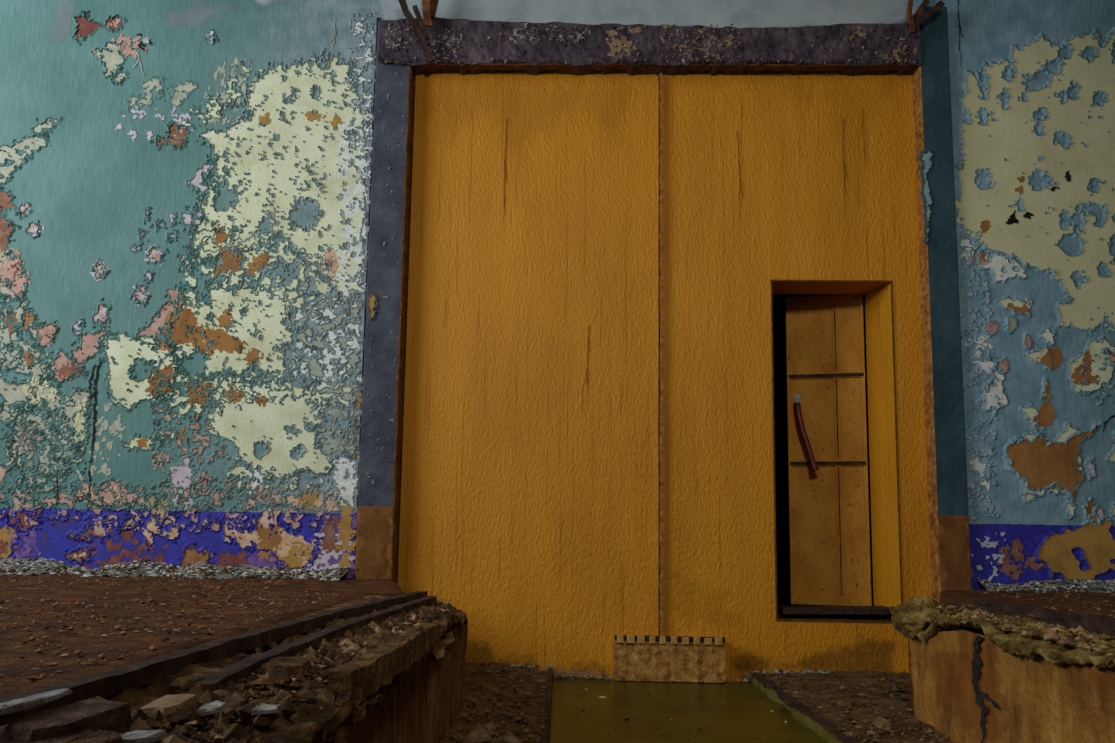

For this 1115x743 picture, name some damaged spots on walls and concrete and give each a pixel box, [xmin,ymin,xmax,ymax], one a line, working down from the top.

peeling [0,10,411,578]
peeling [954,26,1115,582]
crack [1088,415,1115,432]